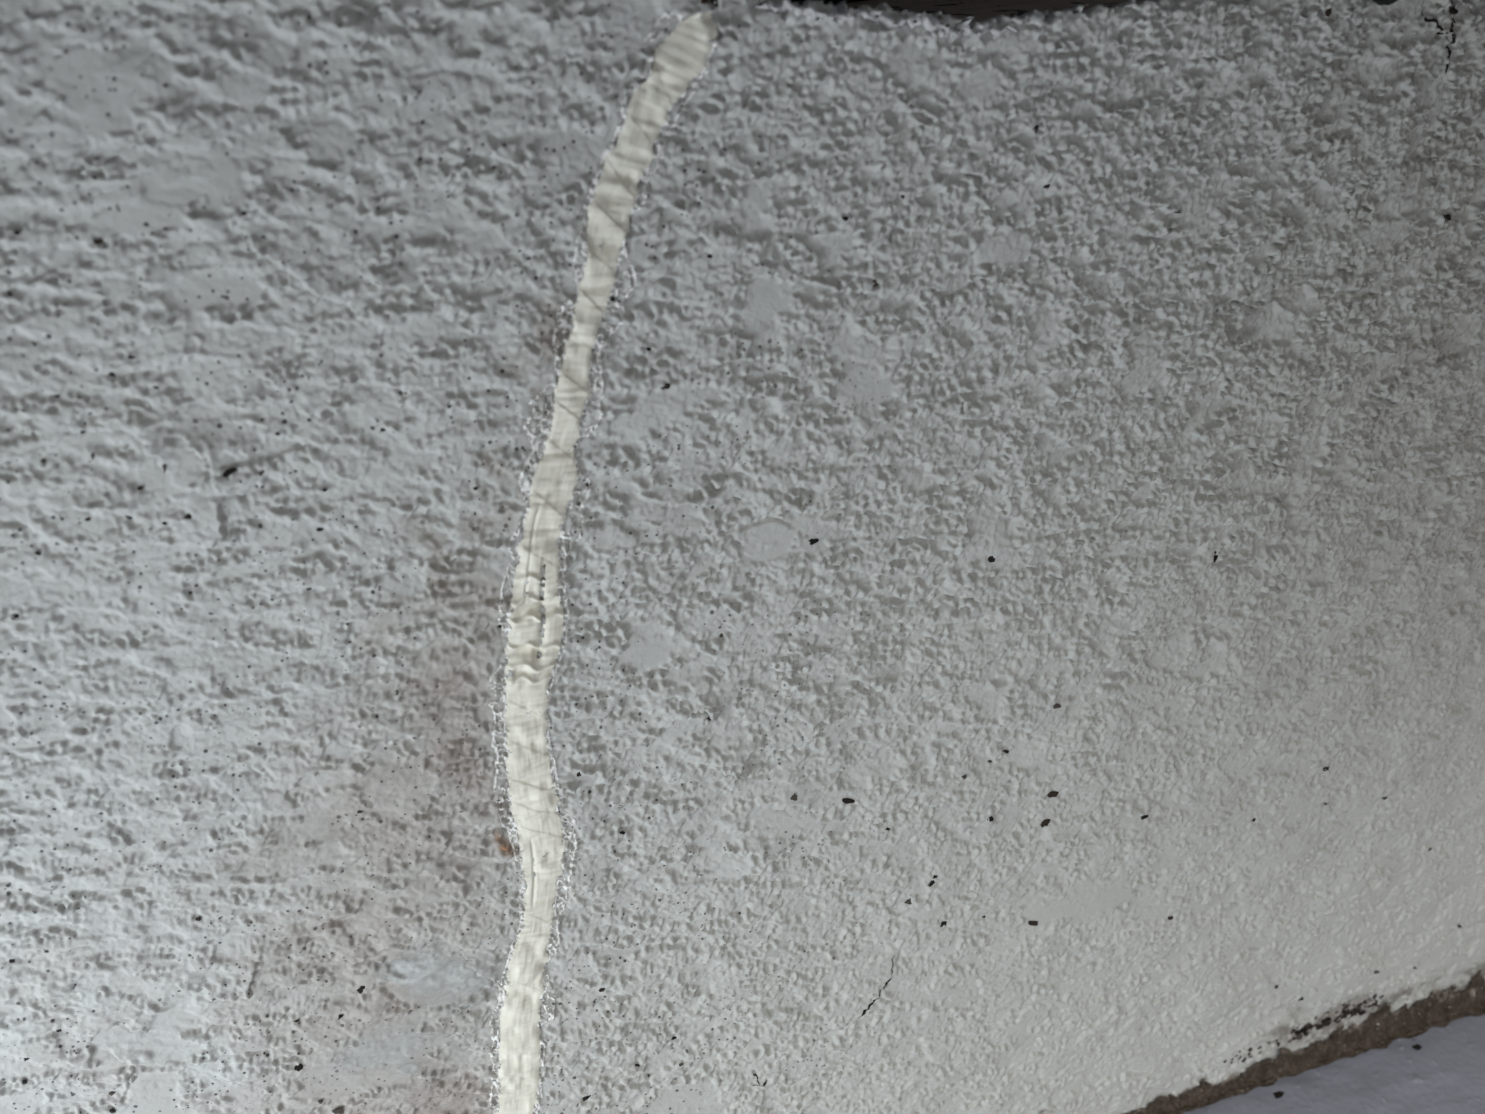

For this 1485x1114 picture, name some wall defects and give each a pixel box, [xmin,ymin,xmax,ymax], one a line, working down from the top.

crack [488,0,719,1114]